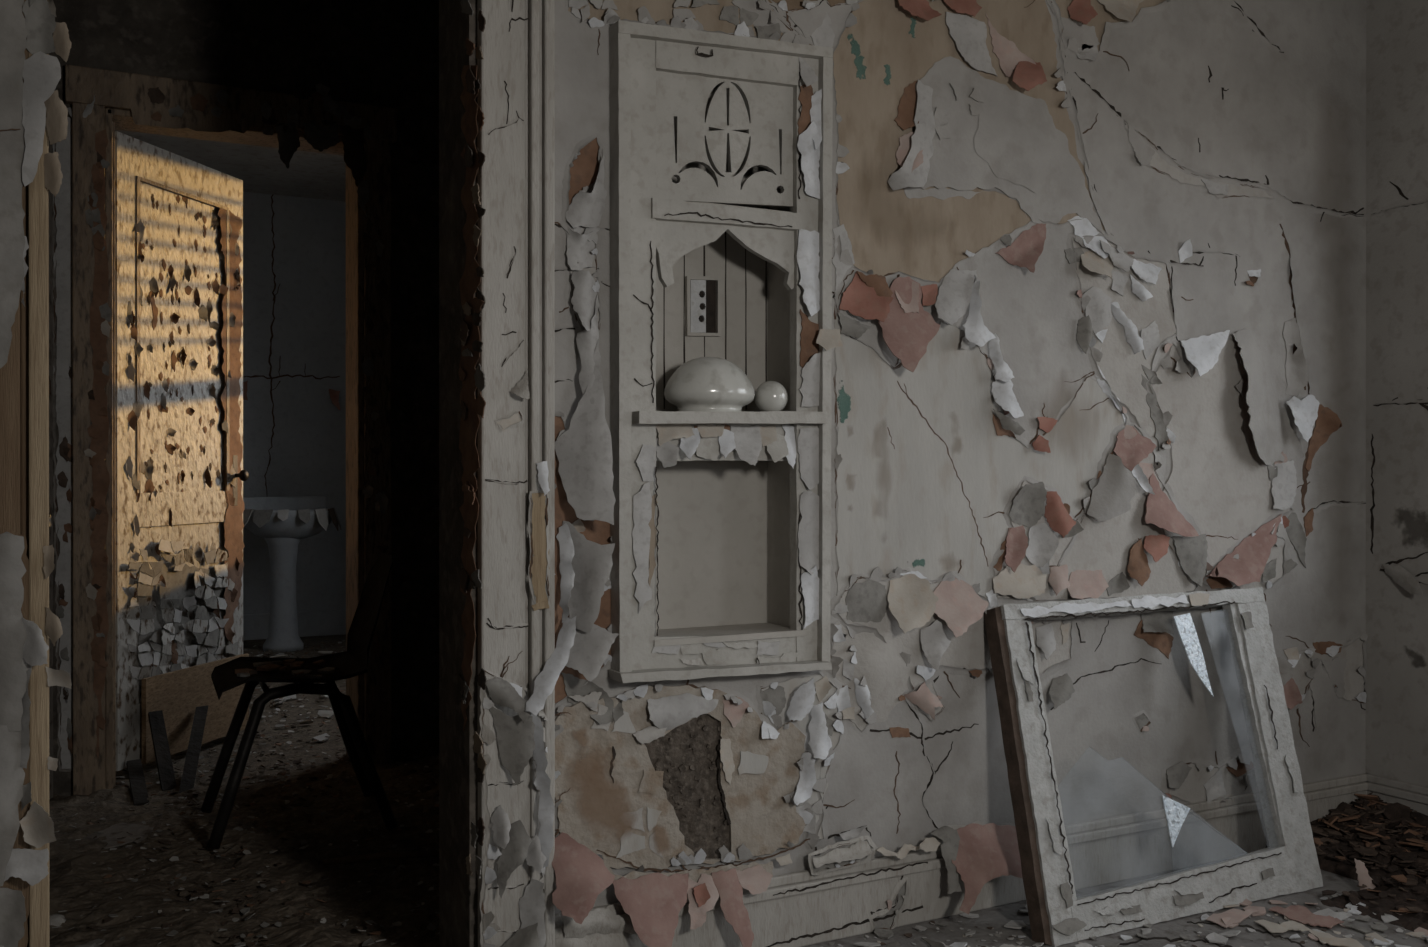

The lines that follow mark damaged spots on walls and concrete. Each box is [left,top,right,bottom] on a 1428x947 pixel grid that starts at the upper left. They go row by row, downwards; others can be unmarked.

peeling [0,0,248,947]
peeling [131,83,371,217]
peeling [458,0,1310,947]
crack [1045,0,1428,595]
crack [597,668,989,947]